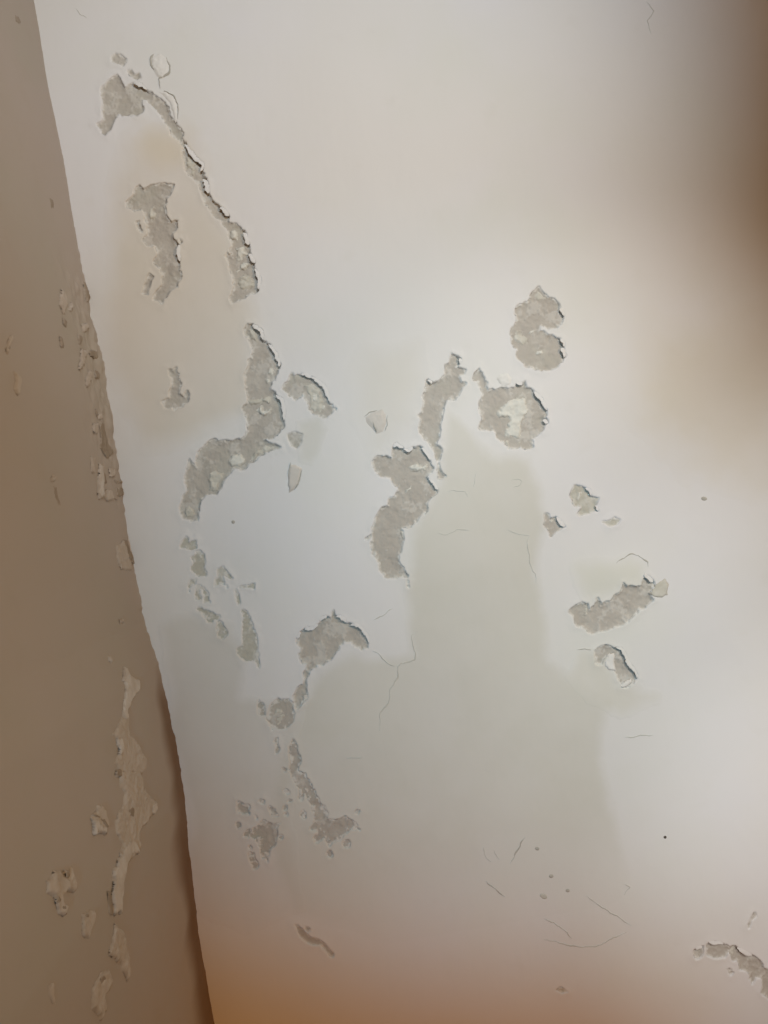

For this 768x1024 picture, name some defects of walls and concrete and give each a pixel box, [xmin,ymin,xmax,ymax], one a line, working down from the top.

spalling [97,54,262,304]
spalling [510,287,566,371]
spalling [180,324,337,522]
spalling [365,353,548,587]
spalling [570,485,620,527]
spalling [180,537,260,668]
spalling [594,645,638,688]
spalling [568,573,669,633]
peeling [90,667,158,916]
spalling [236,610,369,869]
crack [544,884,630,948]
spalling [693,940,768,998]